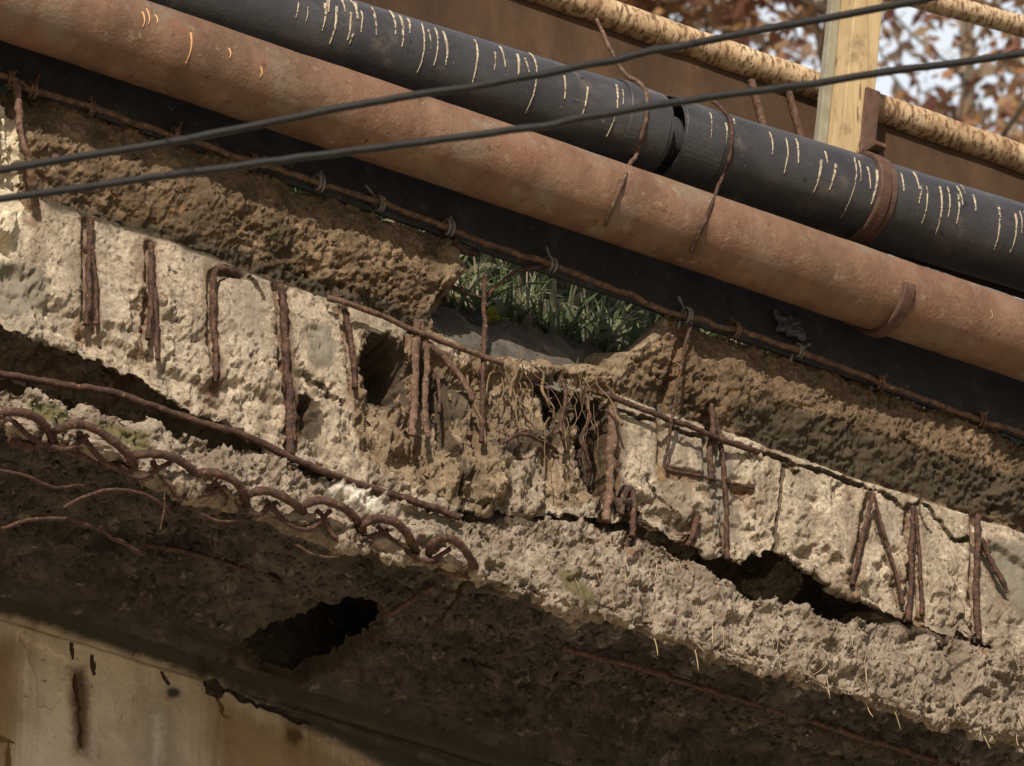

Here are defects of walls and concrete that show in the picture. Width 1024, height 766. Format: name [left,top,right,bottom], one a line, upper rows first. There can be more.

spalling [0,69,1024,641]
crack [618,409,991,556]
rust [72,670,89,750]